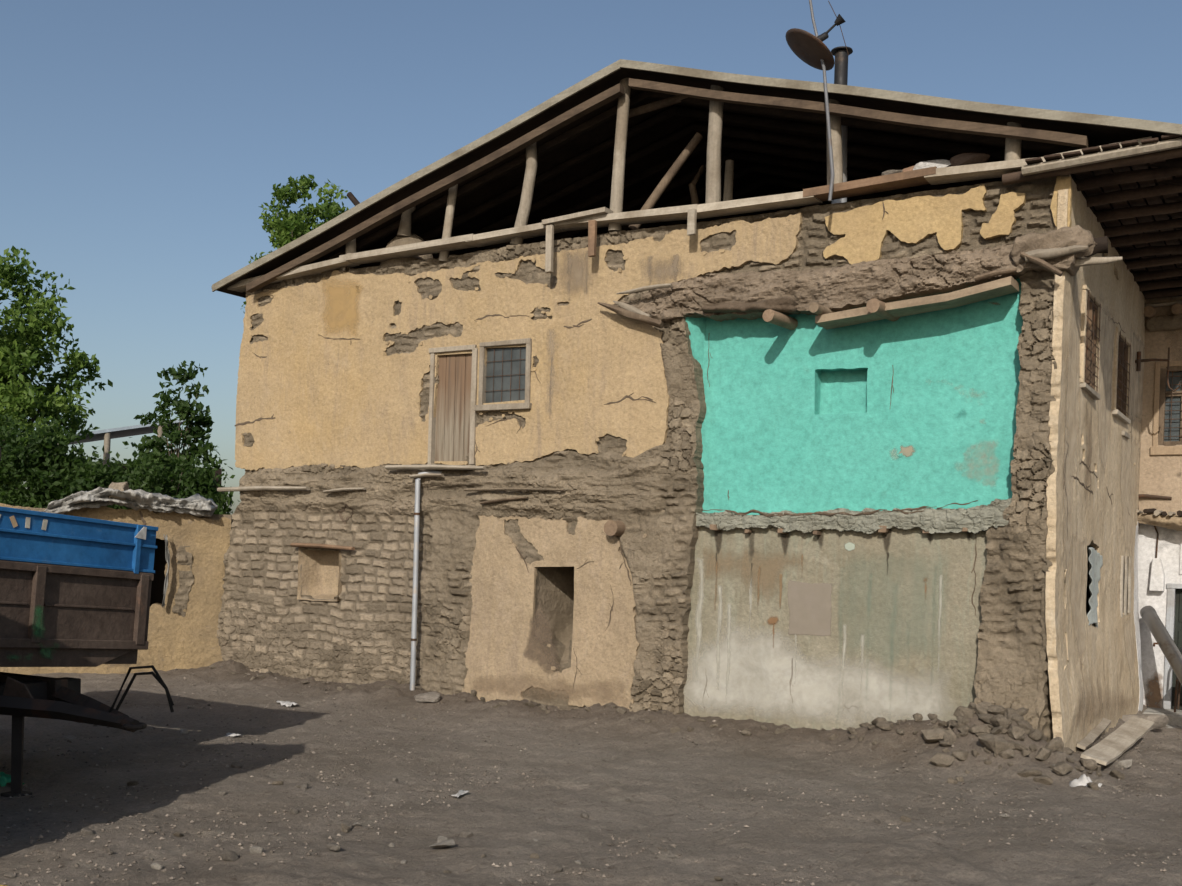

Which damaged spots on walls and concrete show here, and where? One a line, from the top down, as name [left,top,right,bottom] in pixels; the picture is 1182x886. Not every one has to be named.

spalling [650,229,668,242]
spalling [698,230,737,256]
spalling [605,250,629,272]